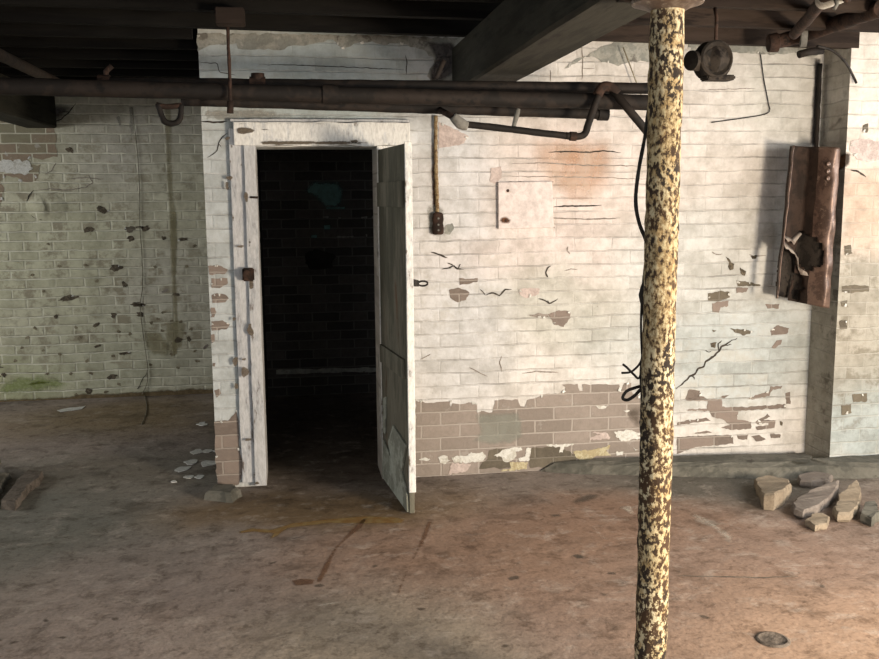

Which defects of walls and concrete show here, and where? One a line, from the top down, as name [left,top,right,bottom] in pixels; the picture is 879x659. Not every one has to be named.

flaking render [0,121,73,205]
flaking render [130,265,230,362]
crack [676,338,737,389]
flaking render [415,382,640,477]
flaking render [677,386,791,454]